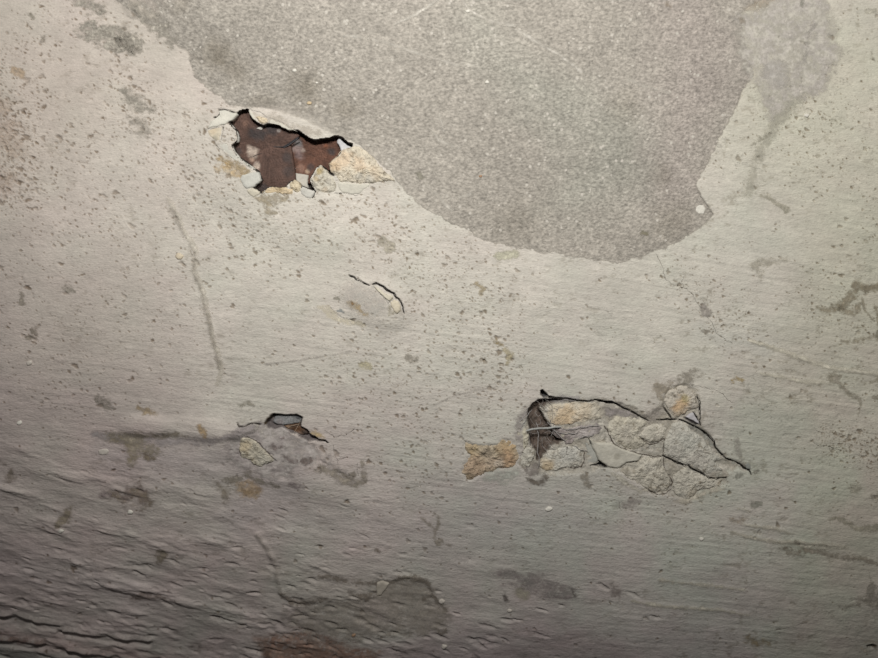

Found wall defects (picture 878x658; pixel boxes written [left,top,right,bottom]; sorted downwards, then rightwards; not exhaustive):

peeling [73,0,144,56]
peeling [117,0,760,264]
spalling [137,414,367,489]
spalling [462,369,759,511]